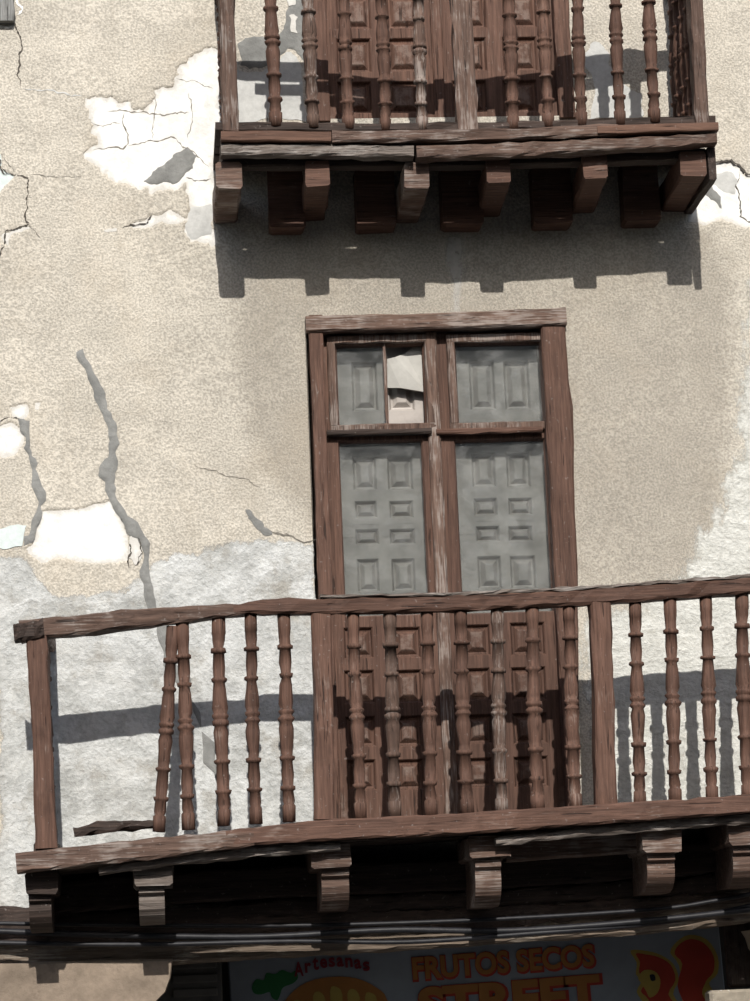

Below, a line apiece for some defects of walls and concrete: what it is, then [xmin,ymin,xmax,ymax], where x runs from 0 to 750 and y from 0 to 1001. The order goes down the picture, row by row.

crack [0,156,78,256]
peeling [83,47,221,247]
peeling [688,163,750,228]
crack [716,159,750,175]
peeling [0,403,40,458]
peeling [0,501,143,566]